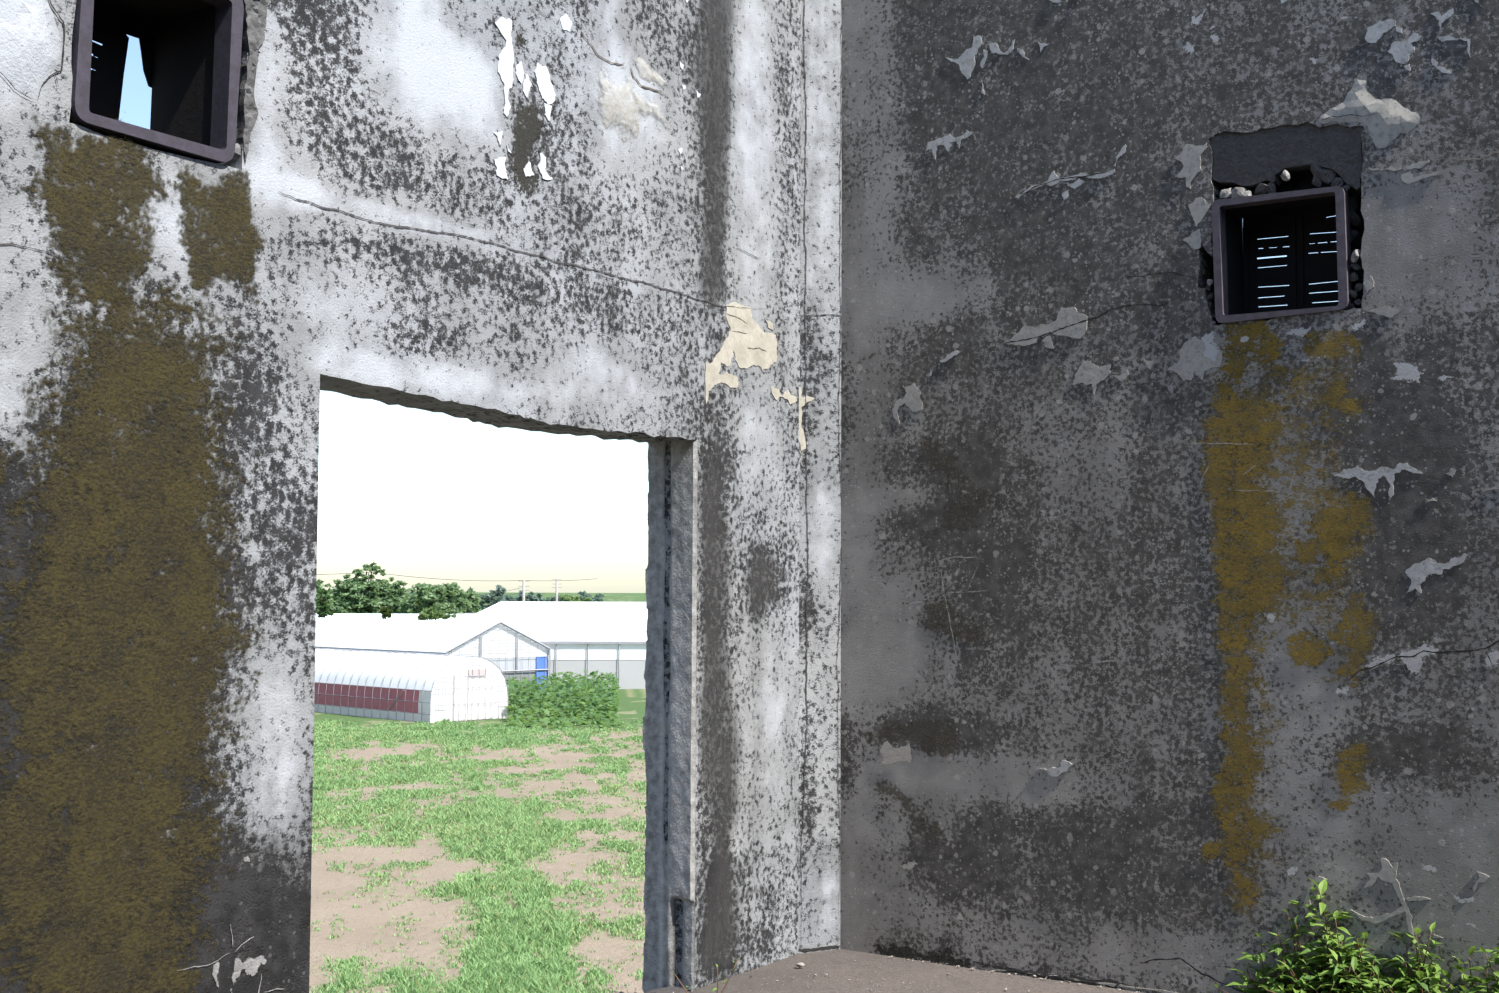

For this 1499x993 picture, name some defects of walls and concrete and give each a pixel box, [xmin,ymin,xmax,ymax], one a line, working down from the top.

peeling [493,17,556,180]
peeling [946,35,1049,95]
peeling [1341,8,1470,71]
water stain [21,115,267,314]
spalling [1172,122,1439,325]
spalling [705,302,815,468]
crack [279,0,843,952]
peeling [1334,463,1422,498]
water stain [703,462,736,965]
water stain [1192,319,1379,912]
crack [1349,640,1499,680]
peeling [1405,553,1468,593]